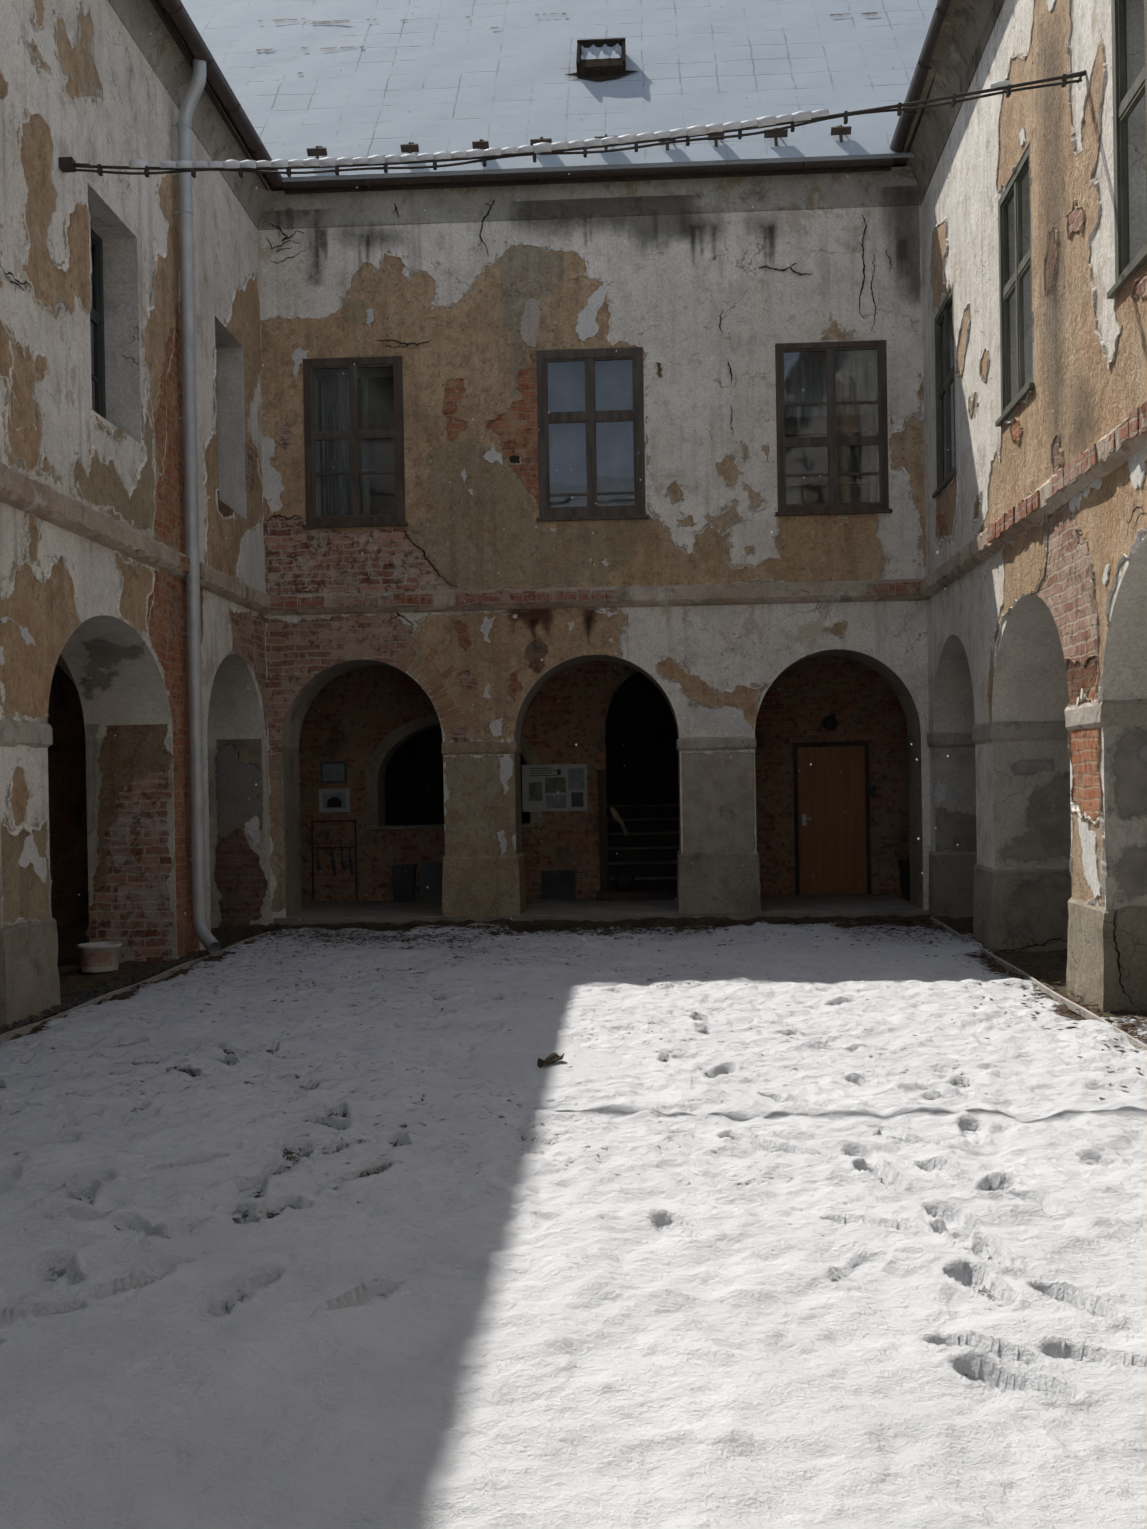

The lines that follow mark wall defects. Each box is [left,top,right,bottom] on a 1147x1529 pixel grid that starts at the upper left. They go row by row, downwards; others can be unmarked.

water stain [522,195,715,251]
water stain [894,186,920,294]
peeling [0,0,1147,963]
water stain [1107,727,1147,819]
water stain [1107,847,1147,901]
crack [1113,912,1133,1005]